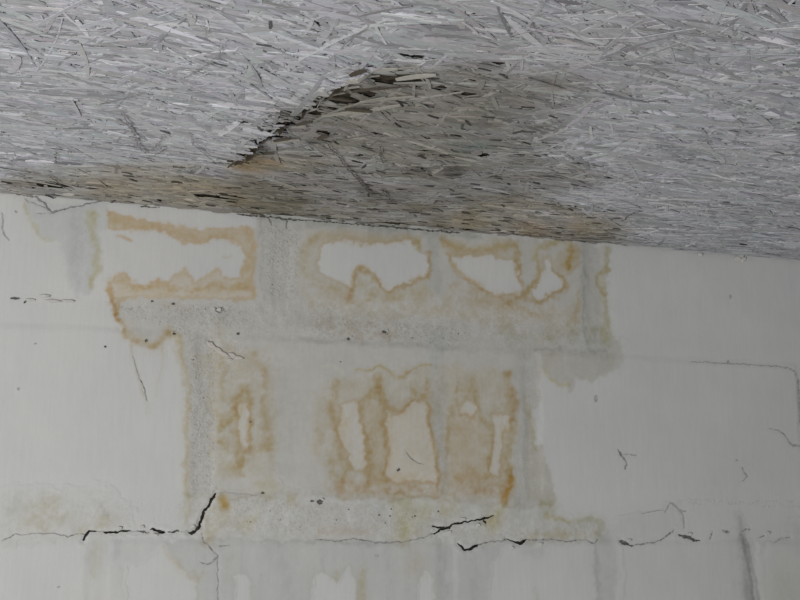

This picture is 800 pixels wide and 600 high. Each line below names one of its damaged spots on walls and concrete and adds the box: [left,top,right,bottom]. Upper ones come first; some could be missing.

damp [0,44,684,600]
crack [2,492,261,600]
crack [316,515,598,551]
crack [619,503,790,547]